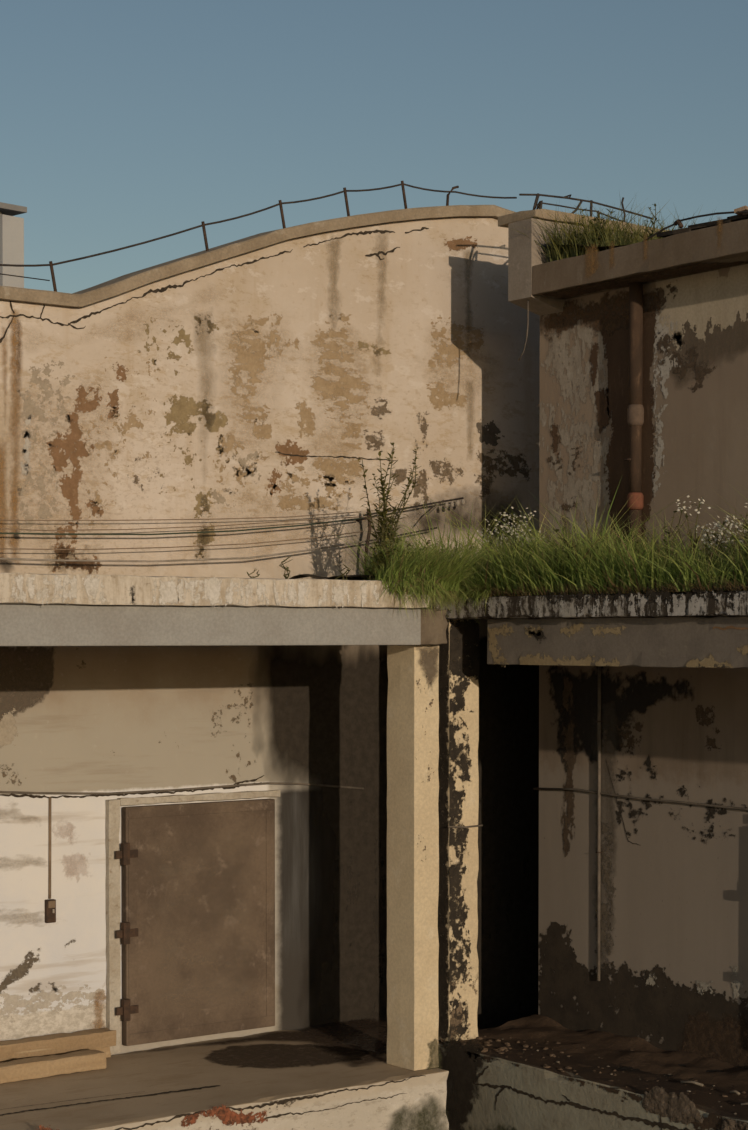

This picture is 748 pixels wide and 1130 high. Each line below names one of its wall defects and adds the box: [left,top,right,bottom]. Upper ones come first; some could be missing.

crack [0,227,429,343]
corrosion [4,313,21,436]
peeling [655,332,716,392]
peeling [13,313,391,574]
corrosion [0,450,18,557]
damp [0,646,54,722]
peeling [686,653,733,668]
damp [203,645,388,1066]
damp [391,601,748,1130]
peeling [0,948,106,1022]
crack [0,1075,425,1130]
crack [473,1066,689,1130]